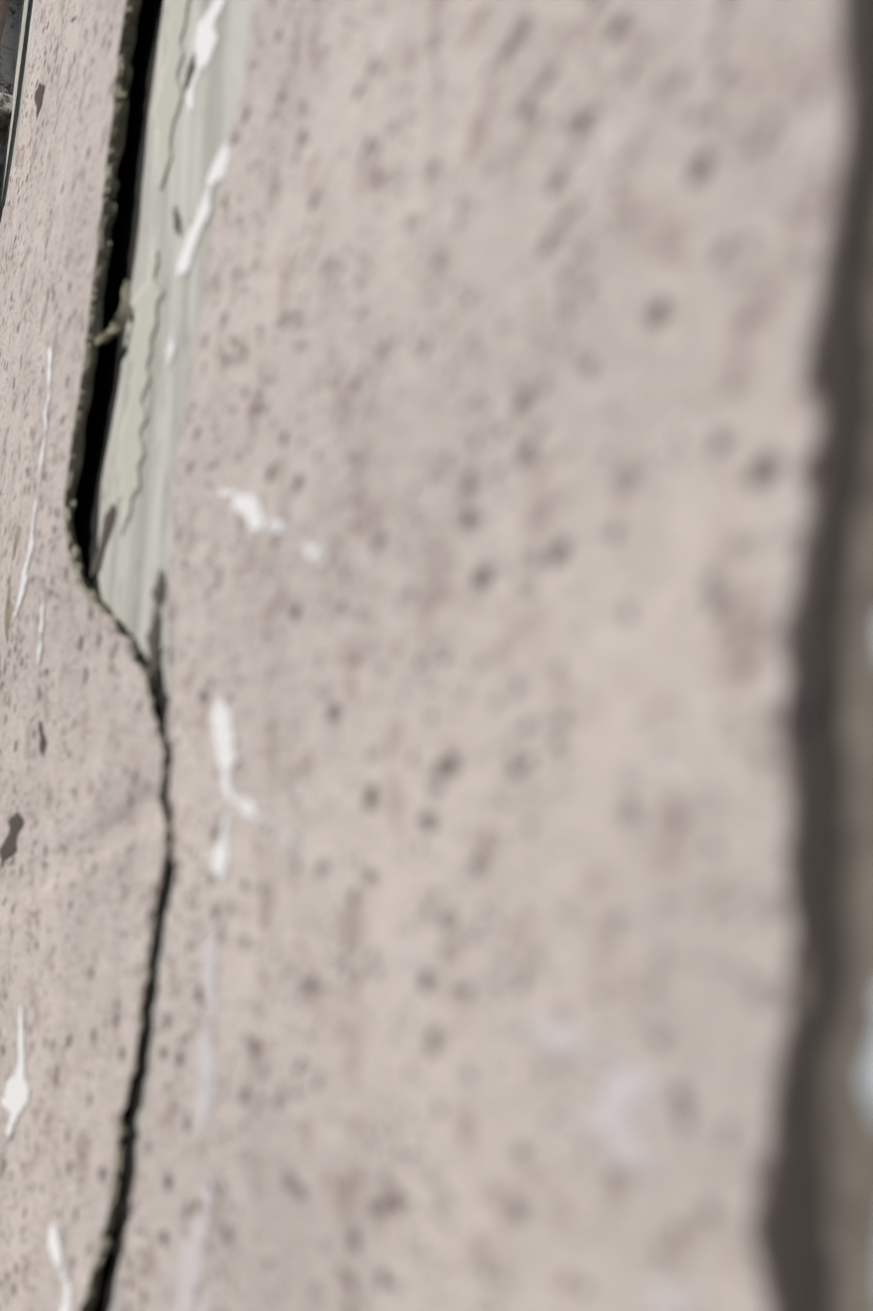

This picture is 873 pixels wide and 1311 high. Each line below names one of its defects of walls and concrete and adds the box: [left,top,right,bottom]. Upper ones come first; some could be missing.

crack [5,525,21,637]
crack [64,0,257,1311]
spalling [0,813,23,868]